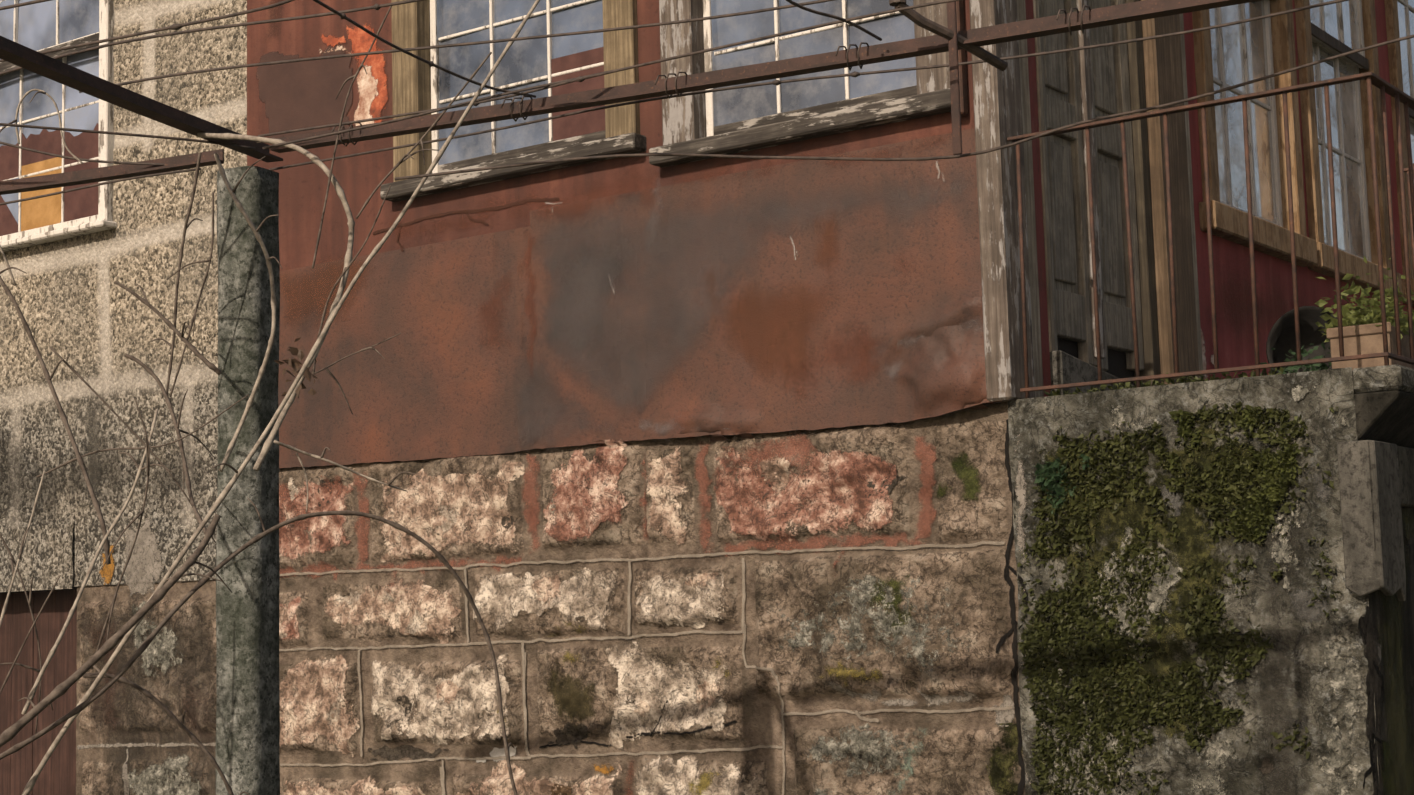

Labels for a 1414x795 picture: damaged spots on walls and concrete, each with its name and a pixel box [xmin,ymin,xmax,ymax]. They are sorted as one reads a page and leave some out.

peeling [320,25,388,126]
water stain [86,402,101,500]
crack [995,419,1028,795]